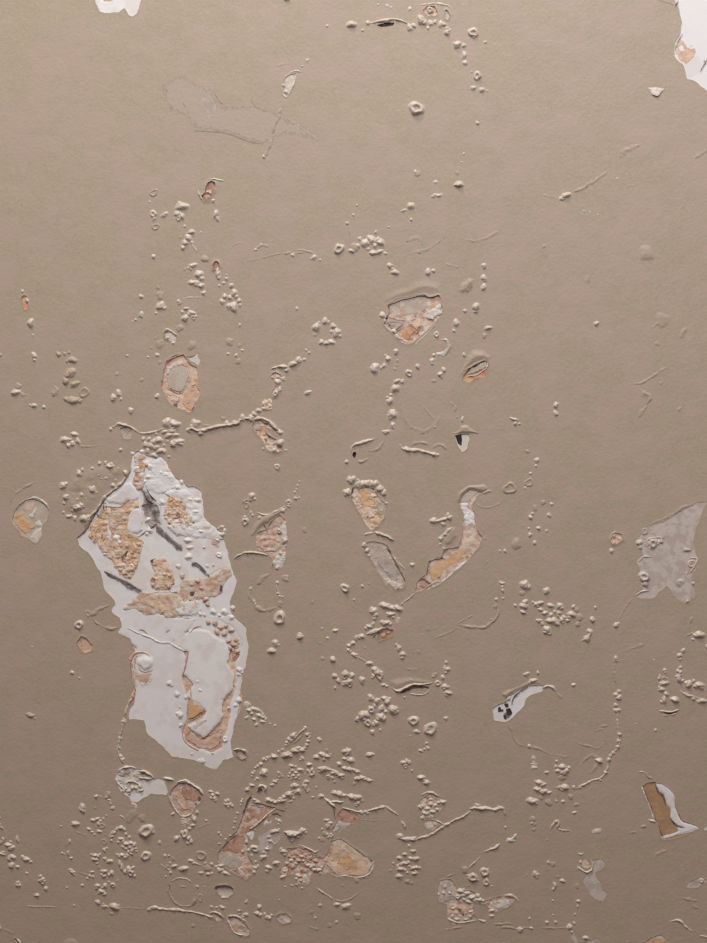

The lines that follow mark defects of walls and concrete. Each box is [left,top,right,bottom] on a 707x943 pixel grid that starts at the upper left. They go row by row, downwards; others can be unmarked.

peeling [93,0,143,19]
peeling [672,0,707,94]
peeling [379,278,446,347]
peeling [154,351,204,415]
peeling [10,481,51,545]
peeling [342,476,504,662]
peeling [607,499,707,606]
peeling [74,449,251,771]
peeling [490,670,563,724]
peeling [114,765,406,900]
peeling [639,771,707,842]